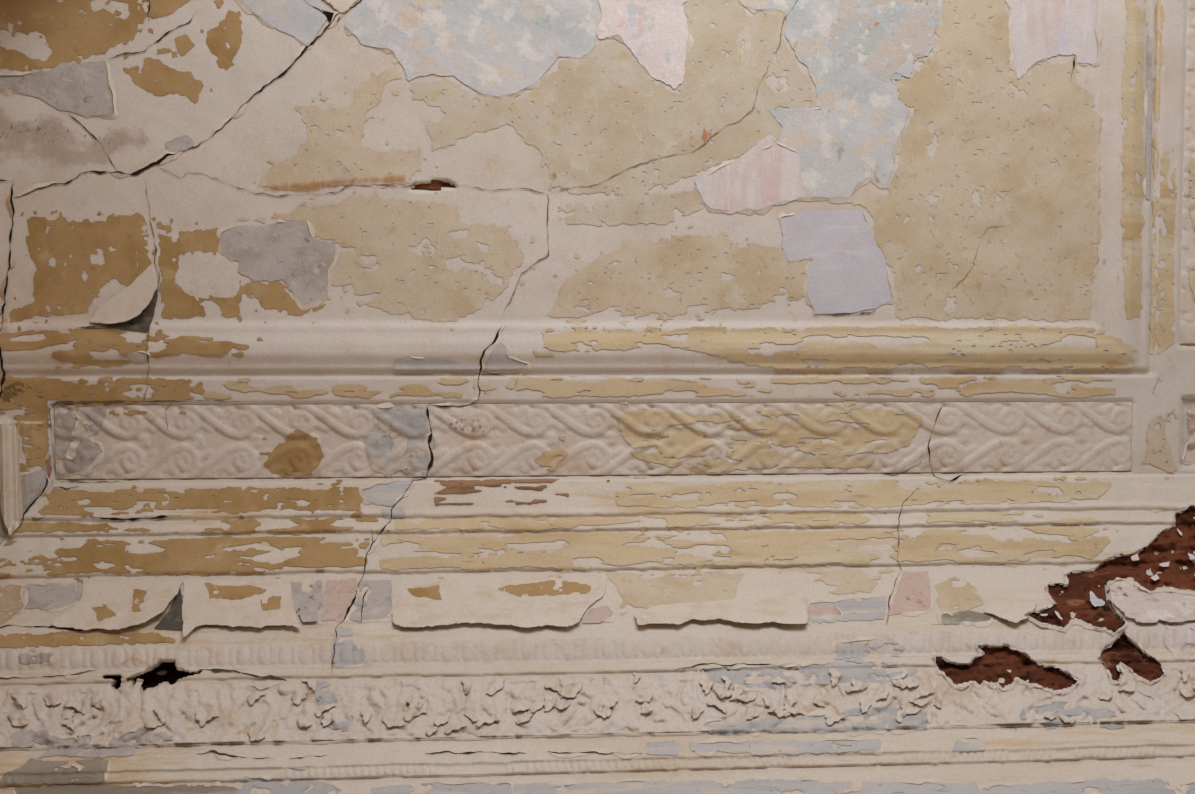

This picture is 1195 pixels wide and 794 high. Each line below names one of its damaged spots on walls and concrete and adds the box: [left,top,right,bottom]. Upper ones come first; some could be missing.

peeling [0,0,1137,404]
crack [0,0,416,544]
crack [332,0,800,671]
peeling [0,376,1195,692]
crack [886,407,966,625]
crack [0,624,115,632]
crack [199,669,287,691]
spalling [932,643,1125,731]
peeling [0,725,347,794]
crack [197,746,326,770]
peeling [371,776,1195,794]
peeling [646,706,928,758]